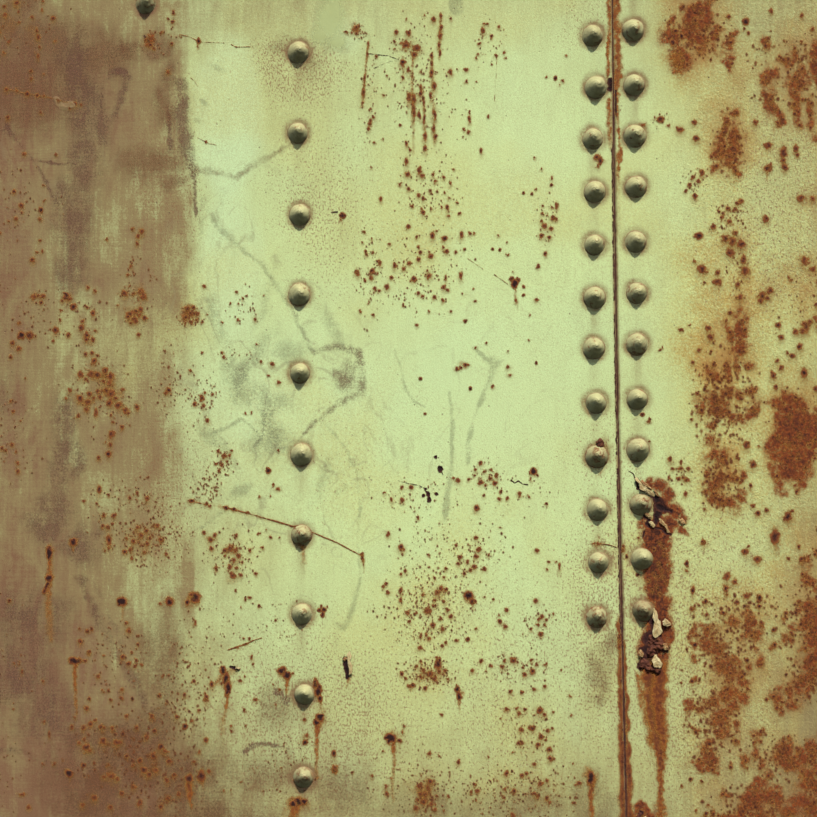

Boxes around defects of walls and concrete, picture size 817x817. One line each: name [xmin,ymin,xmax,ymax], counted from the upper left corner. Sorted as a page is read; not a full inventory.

rust [343,12,483,317]
rust [659,0,750,75]
rust [746,27,817,141]
rust [8,256,152,460]
rust [689,198,817,516]
rust [42,589,284,817]
peeling [342,651,352,682]
rust [367,477,520,705]
rust [382,705,596,817]
peeling [637,608,671,675]
spalling [629,471,686,537]
rust [679,544,817,817]